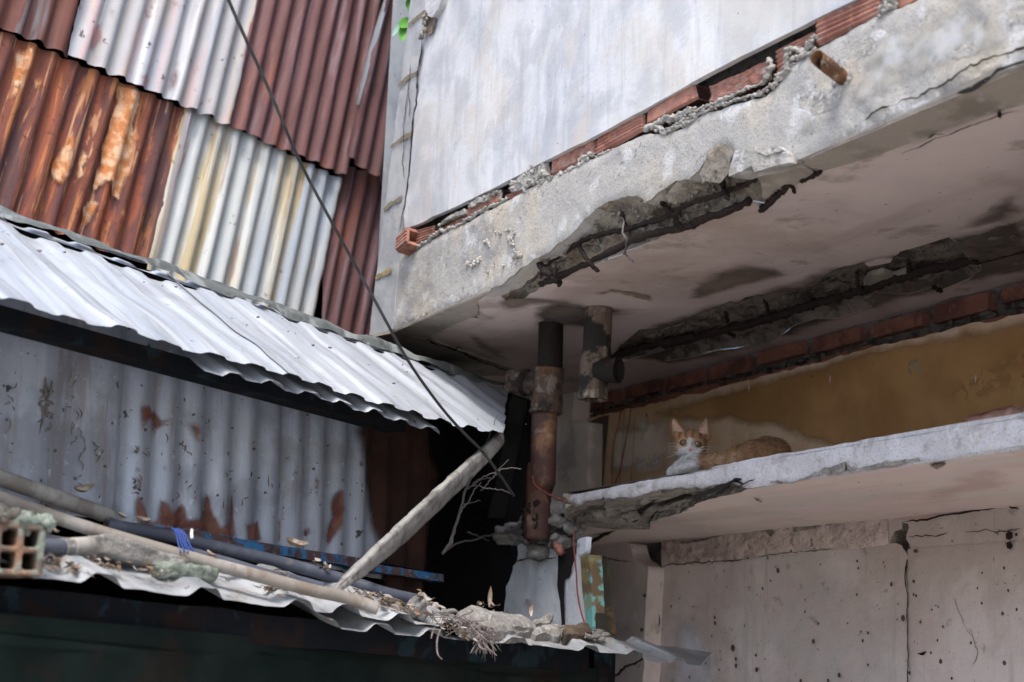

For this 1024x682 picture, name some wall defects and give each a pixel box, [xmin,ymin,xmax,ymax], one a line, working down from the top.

rust [92,25,101,49]
crack [864,46,1024,121]
crack [399,44,422,232]
spalling [491,143,823,299]
spalling [611,224,1024,360]
rust [143,407,162,434]
rust [136,495,235,536]
rust [248,521,260,540]
rust [327,491,344,543]
spalling [562,478,753,530]
crack [906,506,1019,537]
crack [954,599,978,666]